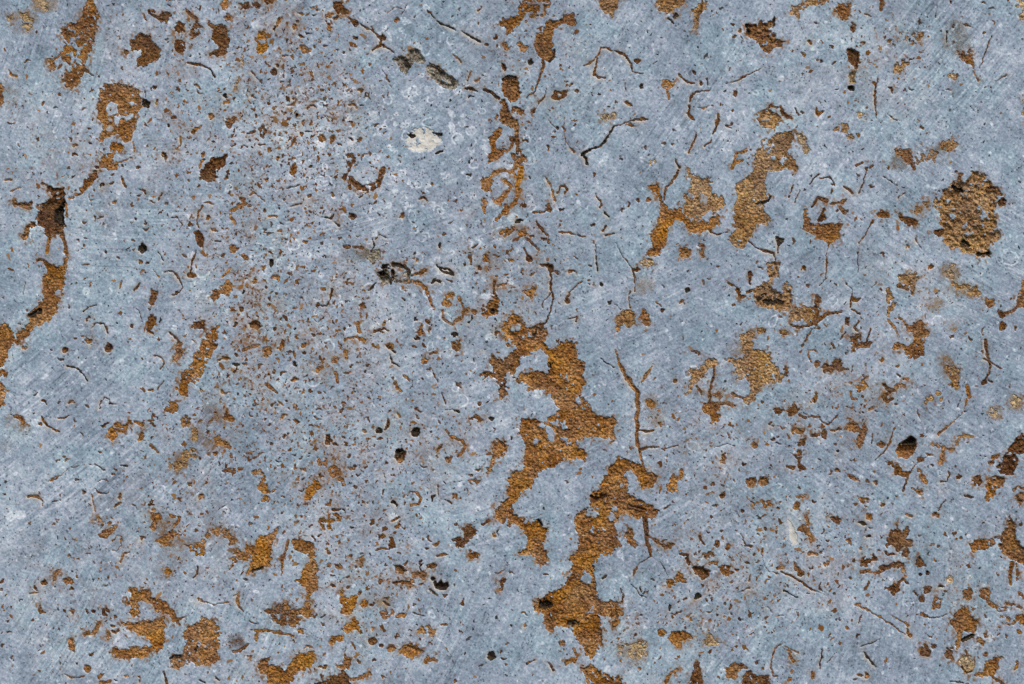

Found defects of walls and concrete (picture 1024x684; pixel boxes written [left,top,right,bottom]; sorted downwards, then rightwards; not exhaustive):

spalling [0,0,158,407]
spalling [392,0,576,275]
spalling [620,101,824,286]
spalling [876,139,1013,258]
spalling [68,202,618,684]
spalling [607,301,665,333]
spalling [510,456,764,684]
spalling [673,328,821,472]
spalling [710,462,1024,684]
spalling [956,433,1024,506]